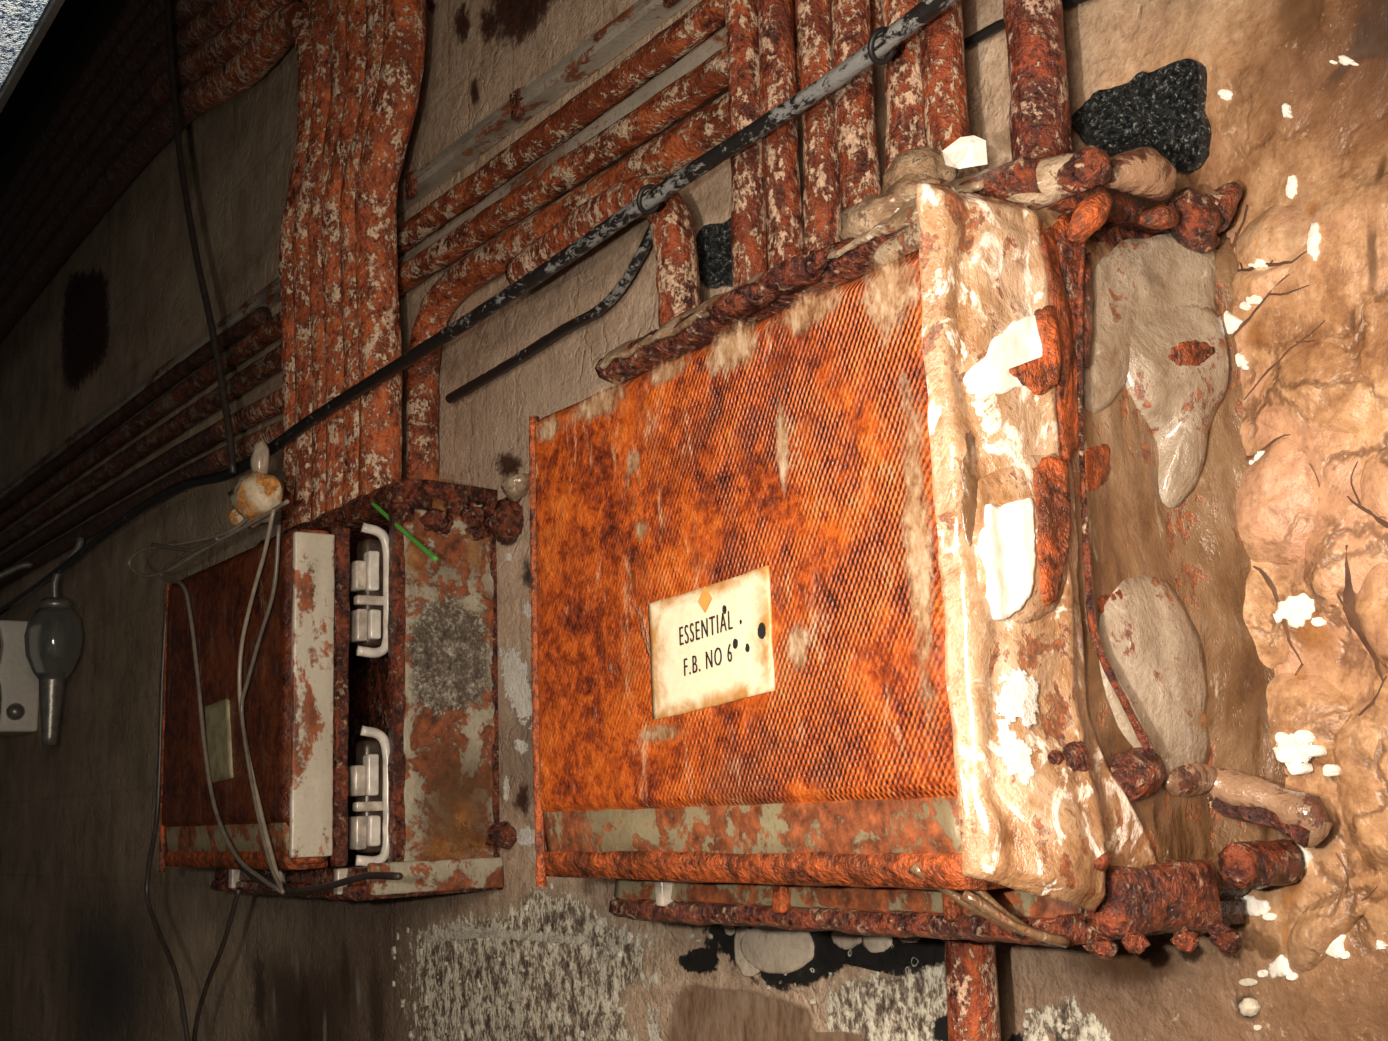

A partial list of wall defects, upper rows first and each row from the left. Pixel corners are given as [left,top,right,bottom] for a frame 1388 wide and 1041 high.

leakage [455,0,551,45]
leakage [1336,23,1384,75]
leakage [470,78,479,104]
leakage [1368,234,1376,281]
leakage [678,924,752,974]
leakage [751,930,945,991]
leakage [932,1015,948,1041]